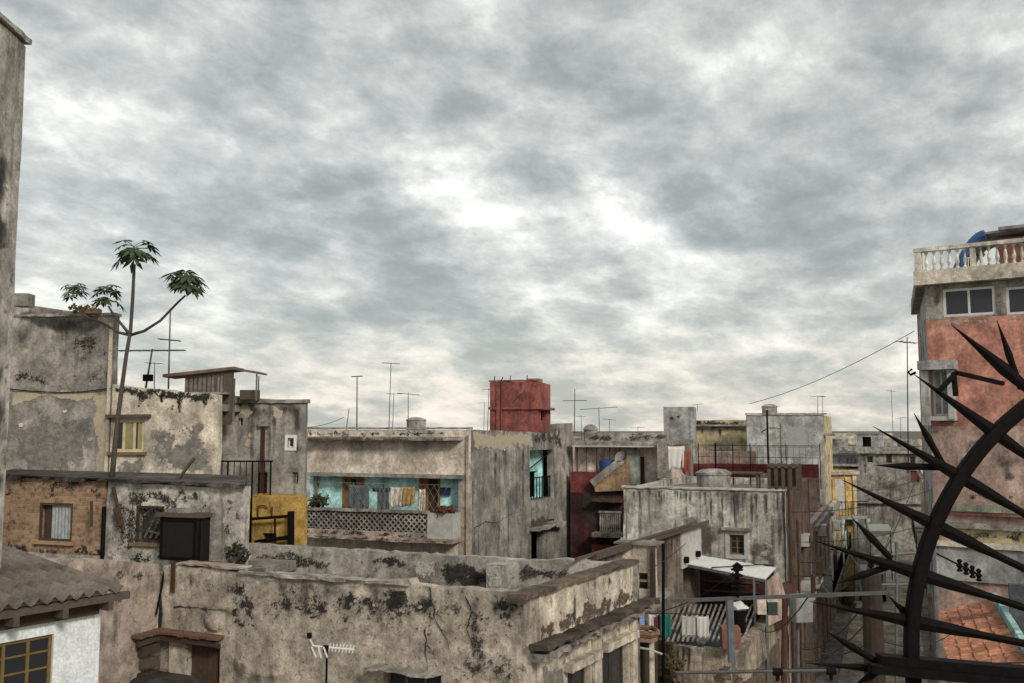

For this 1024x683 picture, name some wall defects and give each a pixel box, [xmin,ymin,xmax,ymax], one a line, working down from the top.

peeling [9,389,107,471]
water stain [230,562,486,630]
water stain [372,555,407,571]
crack [424,588,477,661]
water stain [463,596,523,683]
water stain [519,562,568,580]